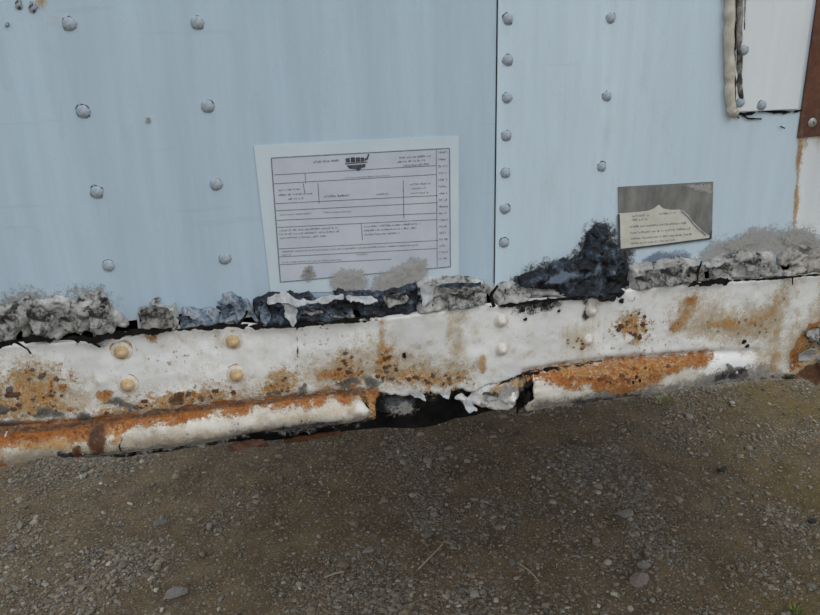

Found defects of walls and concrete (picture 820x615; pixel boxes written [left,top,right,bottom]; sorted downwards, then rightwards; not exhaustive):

peeling [635,273,657,290]
peeling [689,258,765,284]
peeling [60,307,108,332]
peeling [177,315,195,328]
peeling [216,303,235,317]
peeling [281,303,355,327]
peeling [346,292,409,308]
peeling [420,282,482,307]
corrosion [669,294,700,333]
corrosion [702,290,785,348]
corrosion [769,322,820,380]
corrosion [0,317,714,468]